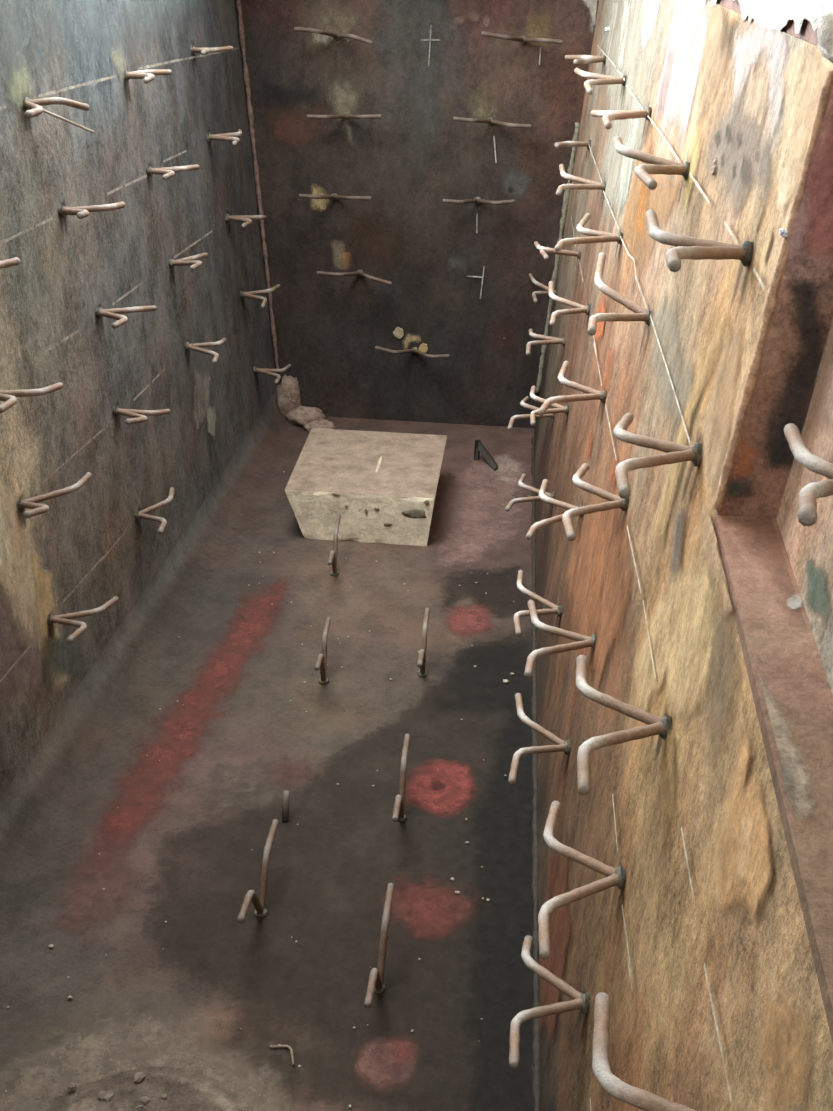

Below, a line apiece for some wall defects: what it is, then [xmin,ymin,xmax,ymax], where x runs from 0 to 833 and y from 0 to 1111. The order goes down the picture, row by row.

corrosion [777,47,824,210]